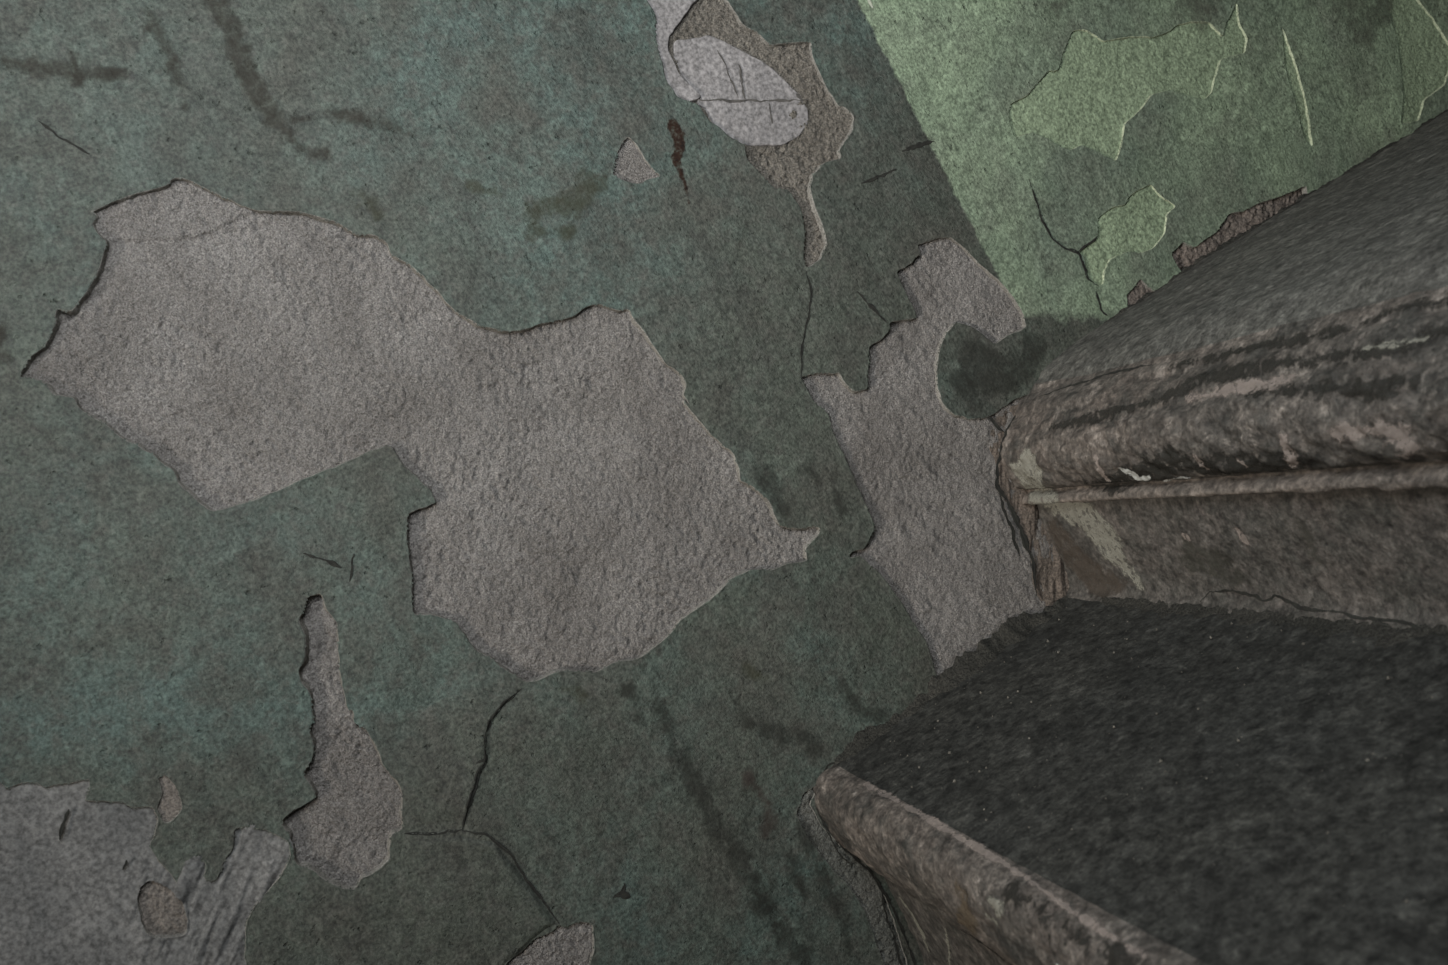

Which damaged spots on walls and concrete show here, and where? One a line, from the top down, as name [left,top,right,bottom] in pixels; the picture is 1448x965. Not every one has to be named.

spalling [611,136,661,185]
spalling [645,0,855,268]
peeling [1008,2,1249,162]
peeling [1079,184,1308,286]
peeling [1281,26,1314,148]
peeling [1386,0,1448,125]
peeling [1362,335,1430,350]
spalling [19,176,821,683]
spalling [800,236,1069,676]
peeling [0,592,404,965]
crack [404,688,559,924]
spalling [505,919,596,965]